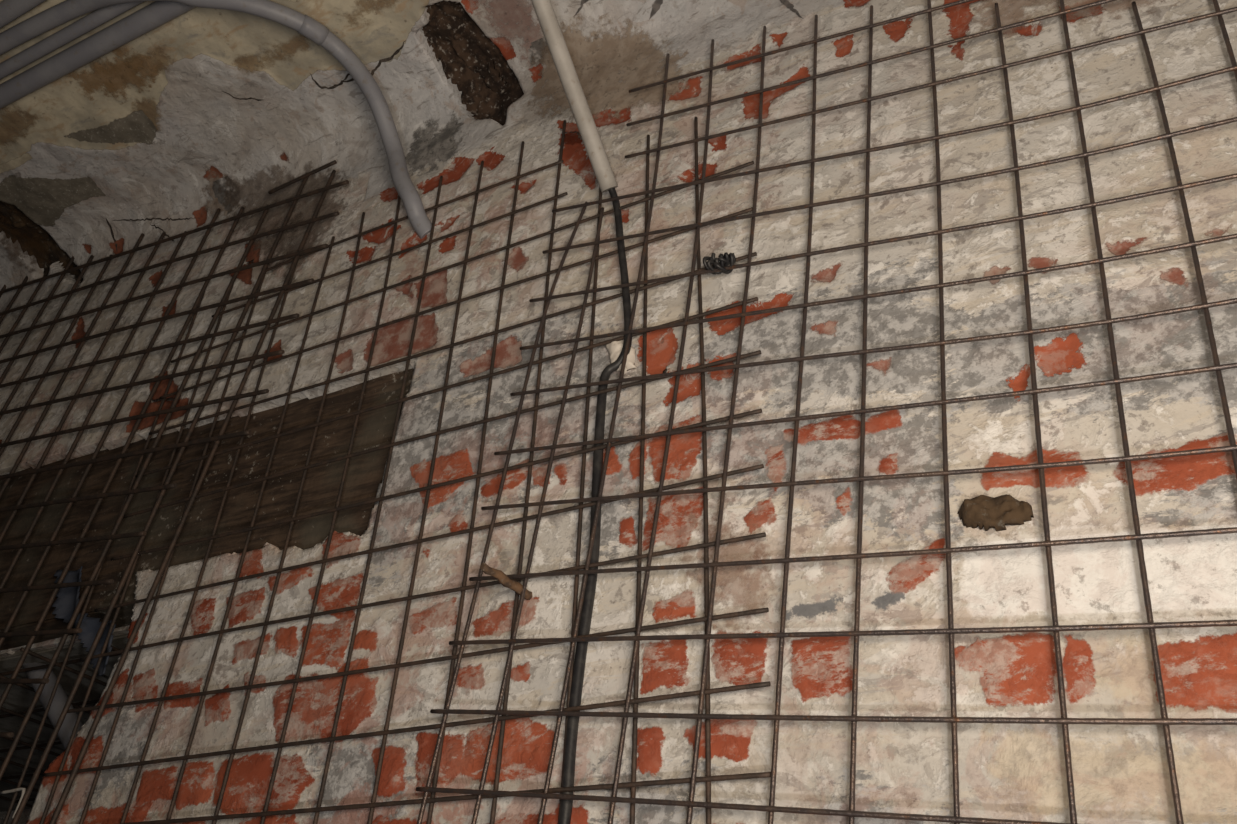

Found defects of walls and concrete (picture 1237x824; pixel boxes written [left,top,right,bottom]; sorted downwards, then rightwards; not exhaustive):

spalling [270,0,543,126]
peeling [741,66,811,120]
peeling [883,17,912,42]
peeling [942,0,983,61]
peeling [0,0,346,287]
peeling [416,146,505,194]
peeling [557,120,596,190]
peeling [812,264,841,282]
peeling [334,270,448,373]
peeling [705,292,794,335]
peeling [637,328,737,406]
peeling [1006,333,1087,401]